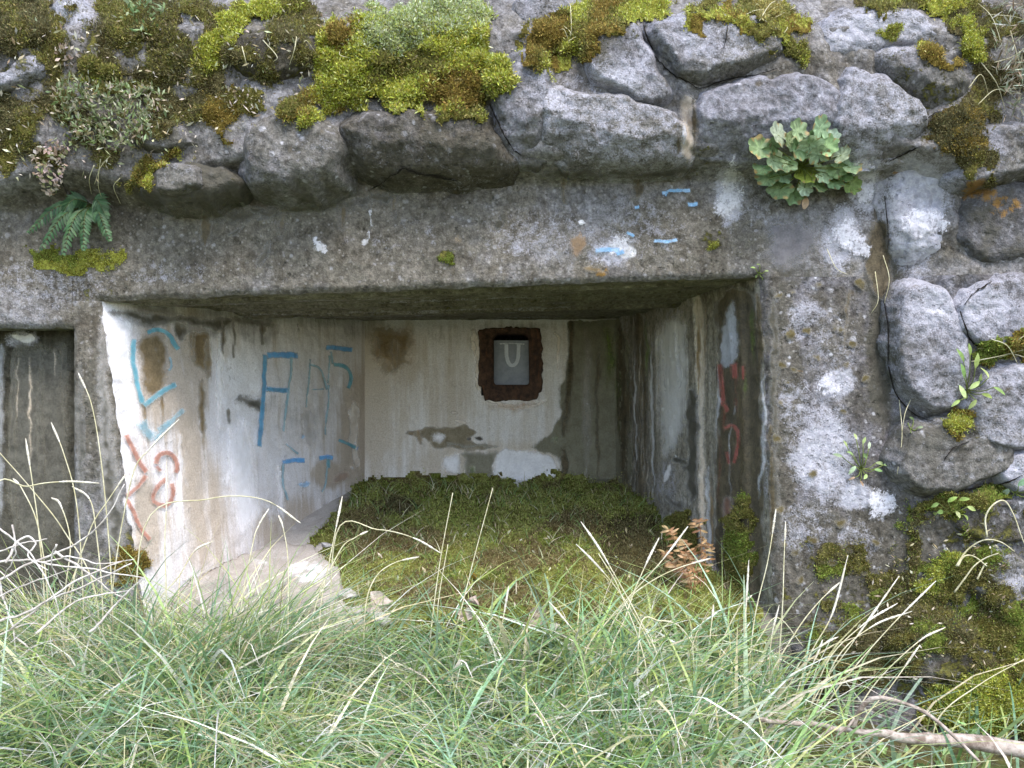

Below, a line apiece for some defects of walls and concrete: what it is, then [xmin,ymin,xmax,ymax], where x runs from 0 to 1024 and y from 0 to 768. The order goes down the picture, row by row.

water stain [109,310,274,529]
water stain [371,328,413,373]
spalling [406,318,633,492]
water stain [627,288,775,611]